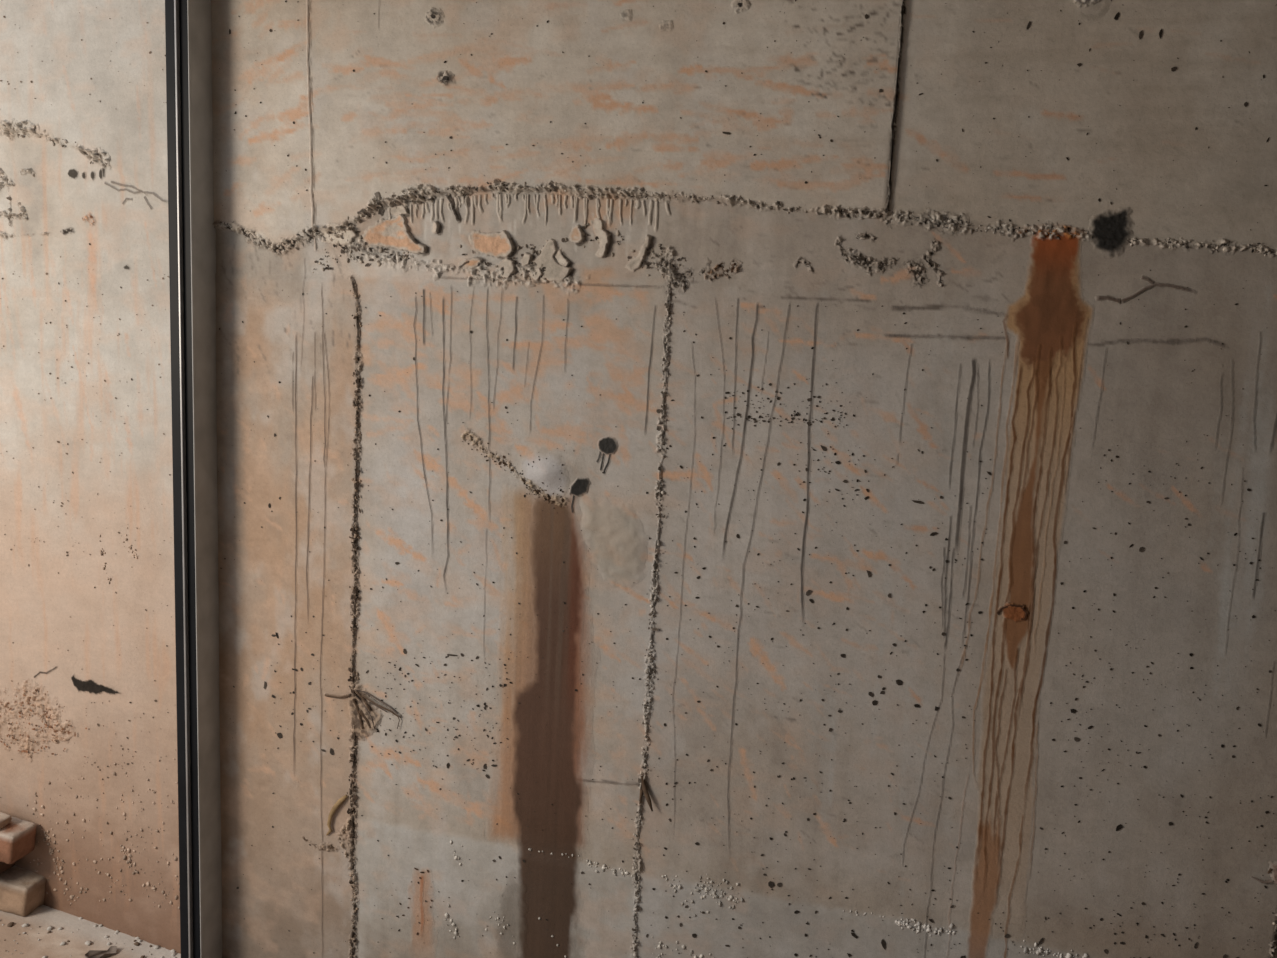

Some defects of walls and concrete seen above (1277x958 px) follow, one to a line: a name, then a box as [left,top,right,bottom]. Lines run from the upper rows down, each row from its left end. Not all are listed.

crack [306,0,319,252]
crack [884,0,908,213]
peeling [213,179,1092,296]
crack [885,305,1007,340]
crack [1094,337,1226,348]
spalling [1127,236,1277,258]
crack [345,274,364,958]
water stain [413,284,600,958]
crack [582,246,677,958]
corrosion [946,224,1095,958]
crack [1268,914,1277,958]